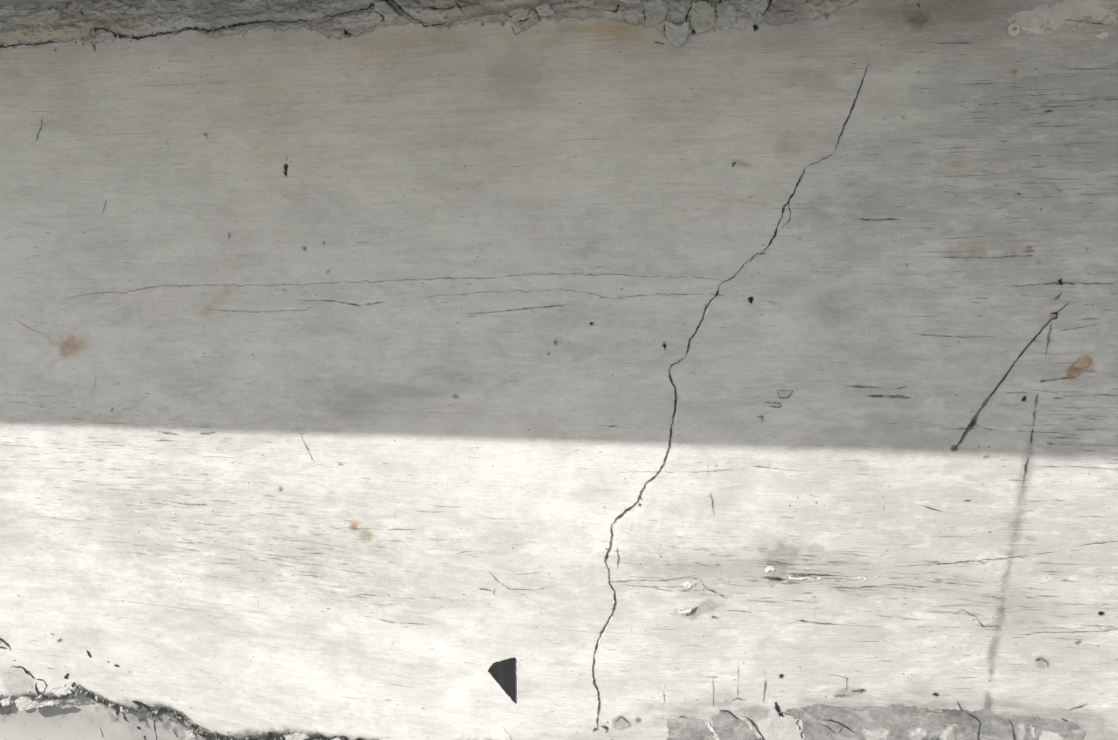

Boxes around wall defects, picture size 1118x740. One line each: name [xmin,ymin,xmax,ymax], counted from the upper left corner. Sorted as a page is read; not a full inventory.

crack [430,61,870,740]
spalling [0,638,361,740]
peeling [667,688,1085,740]